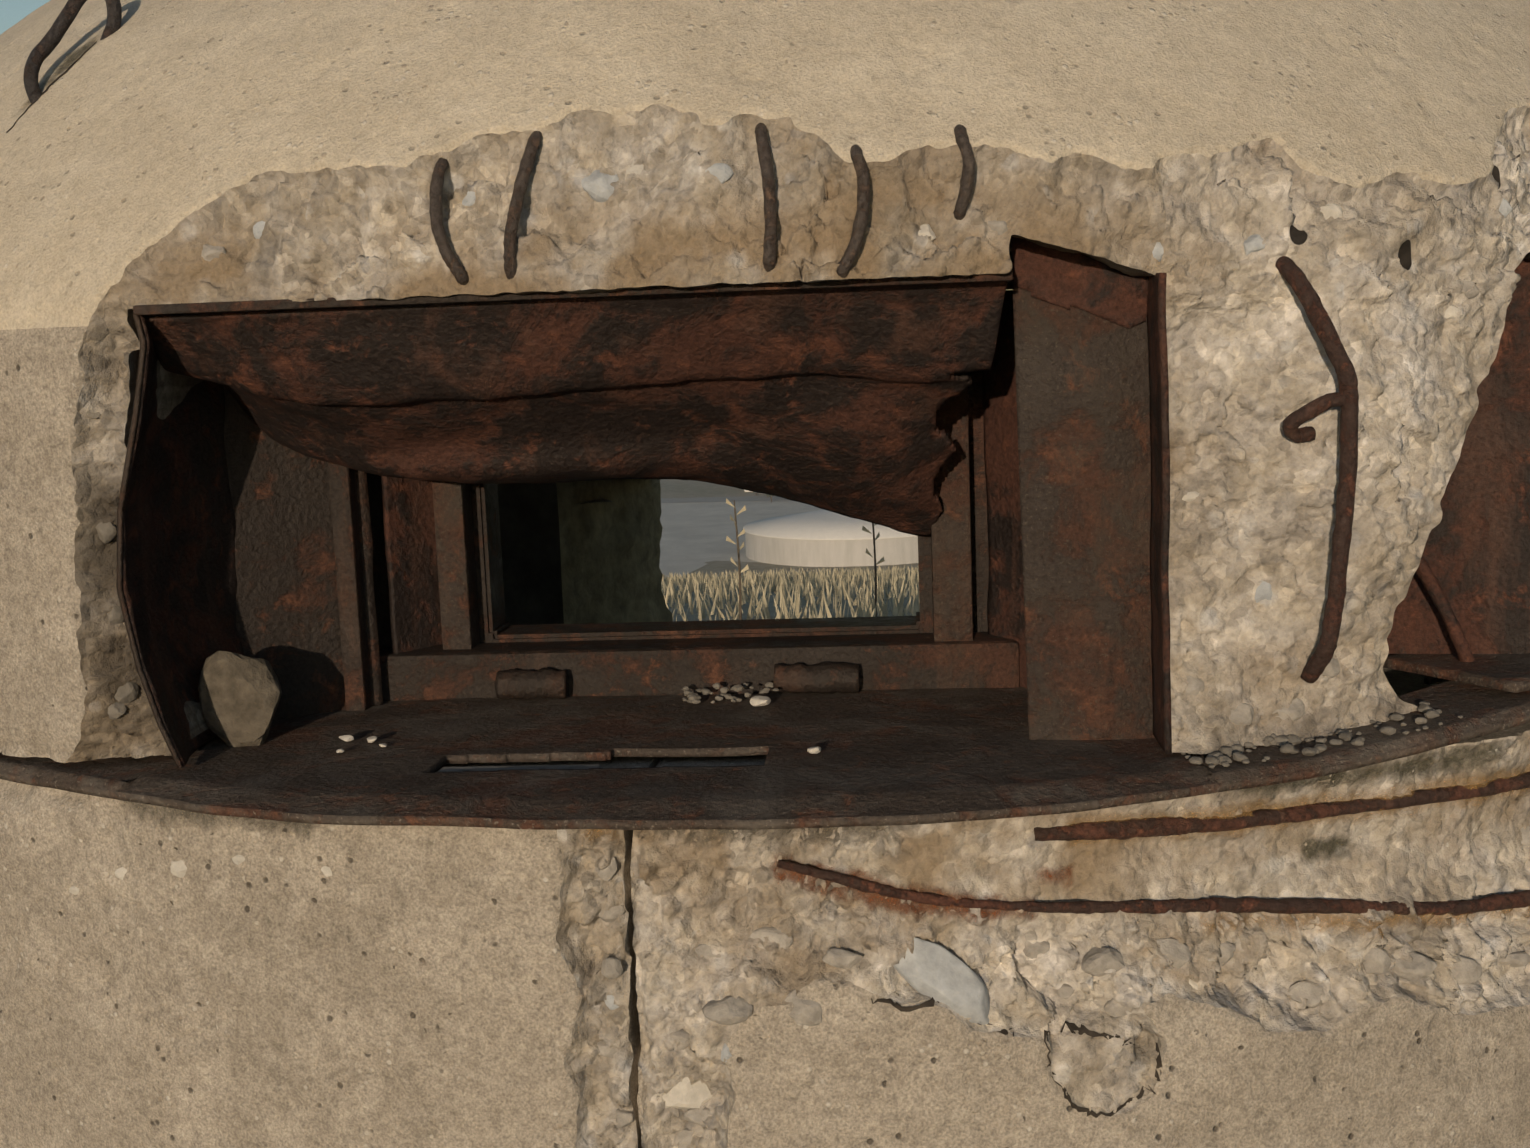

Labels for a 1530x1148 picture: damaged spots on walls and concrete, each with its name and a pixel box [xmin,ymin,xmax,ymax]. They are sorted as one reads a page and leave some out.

spalling [66,104,1530,763]
corrosion [774,862,1030,921]
spalling [556,730,1530,1148]